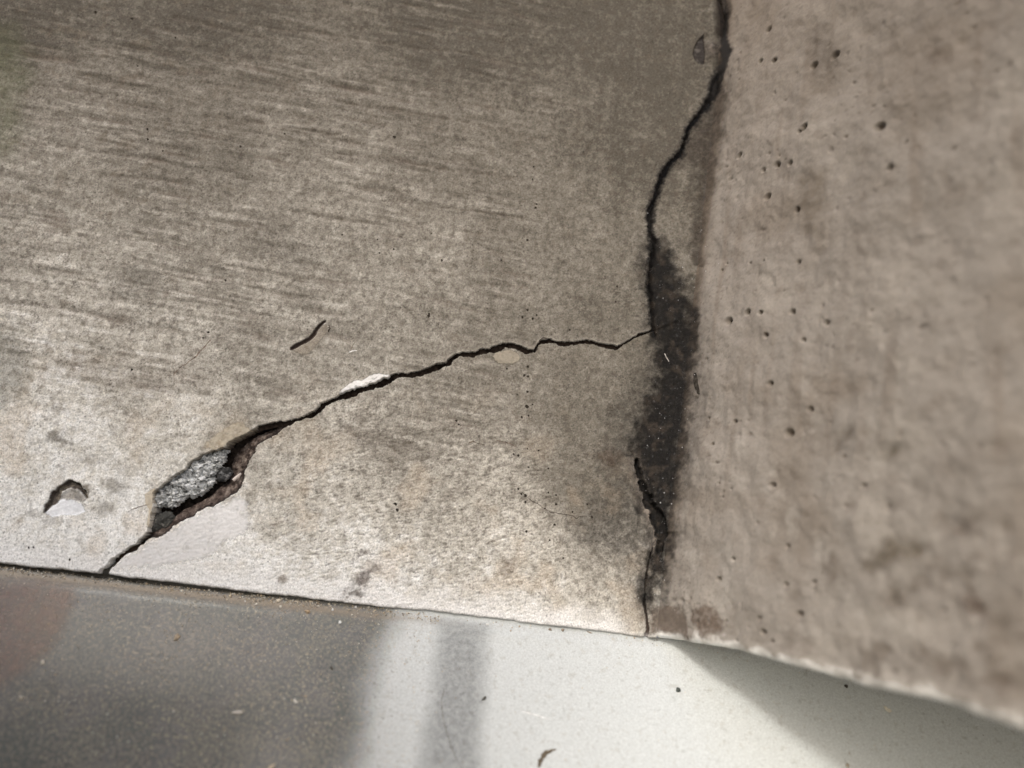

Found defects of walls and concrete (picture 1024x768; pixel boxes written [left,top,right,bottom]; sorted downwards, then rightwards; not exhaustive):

crack [259,7,731,432]
crack [173,340,211,375]
spalling [45,481,89,517]
crack [115,534,153,562]
flaking render [114,422,286,570]
damp [628,238,722,633]